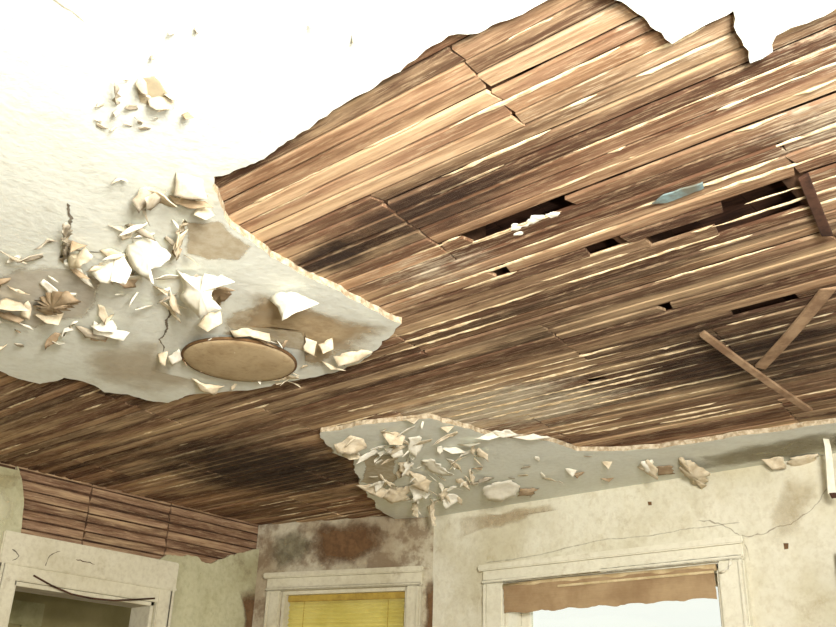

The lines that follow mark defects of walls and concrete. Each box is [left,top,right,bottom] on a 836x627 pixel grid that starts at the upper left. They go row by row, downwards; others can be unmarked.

peeling [94,76,177,131]
crack [62,203,99,260]
peeling [0,172,333,357]
peeling [158,349,187,366]
peeling [333,349,372,367]
flaking render [18,466,258,563]
peeling [334,426,462,526]
peeling [482,478,539,502]
peeling [475,430,550,441]
damp [718,436,836,464]
peeling [761,438,836,499]
spalling [316,524,379,561]